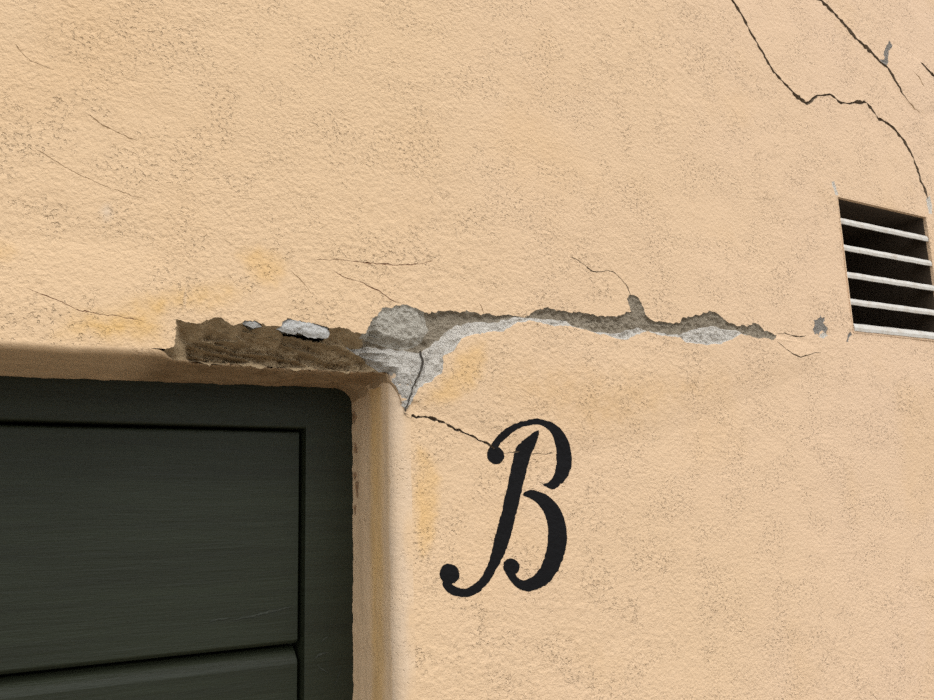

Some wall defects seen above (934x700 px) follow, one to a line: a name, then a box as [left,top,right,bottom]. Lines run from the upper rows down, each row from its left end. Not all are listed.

crack [731,0,934,198]
spalling [164,295,776,409]
crack [404,351,552,455]